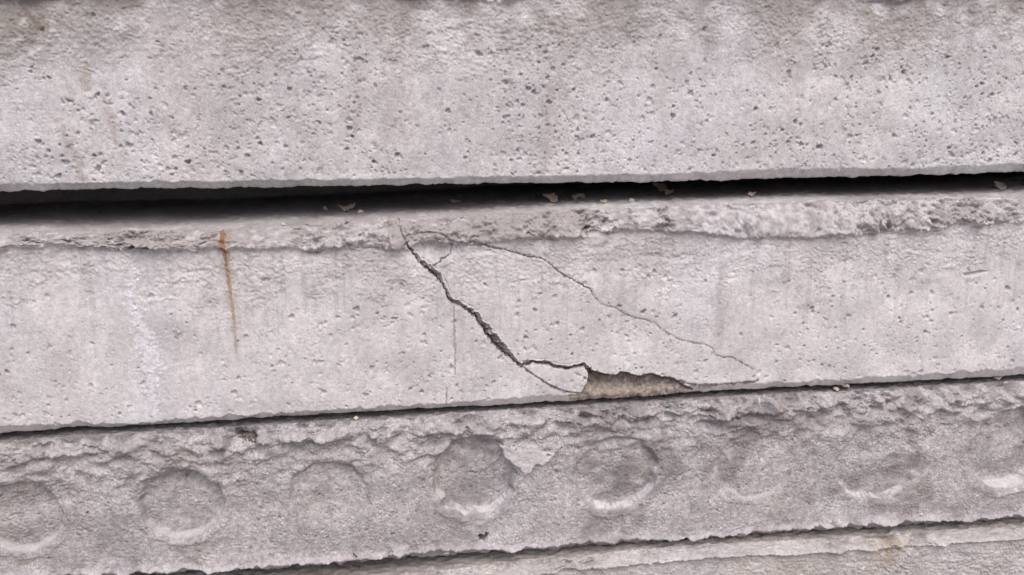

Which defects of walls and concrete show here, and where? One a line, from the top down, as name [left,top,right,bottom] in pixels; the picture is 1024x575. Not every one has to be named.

rust [220,233,235,317]
crack [397,218,759,394]
spalling [0,364,1024,464]